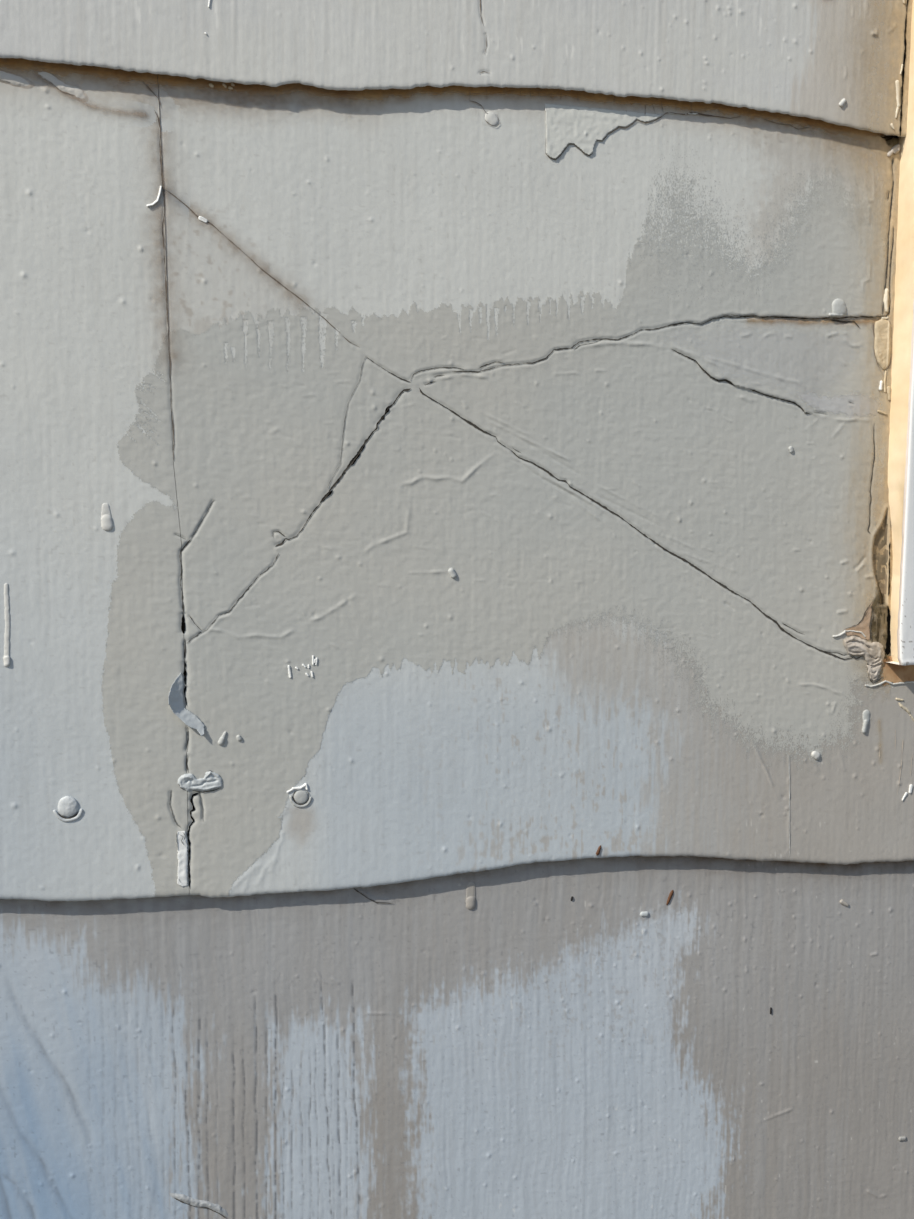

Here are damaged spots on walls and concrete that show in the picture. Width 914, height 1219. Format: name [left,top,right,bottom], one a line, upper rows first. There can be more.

crack [143,0,909,888]
peeling [545,104,740,160]